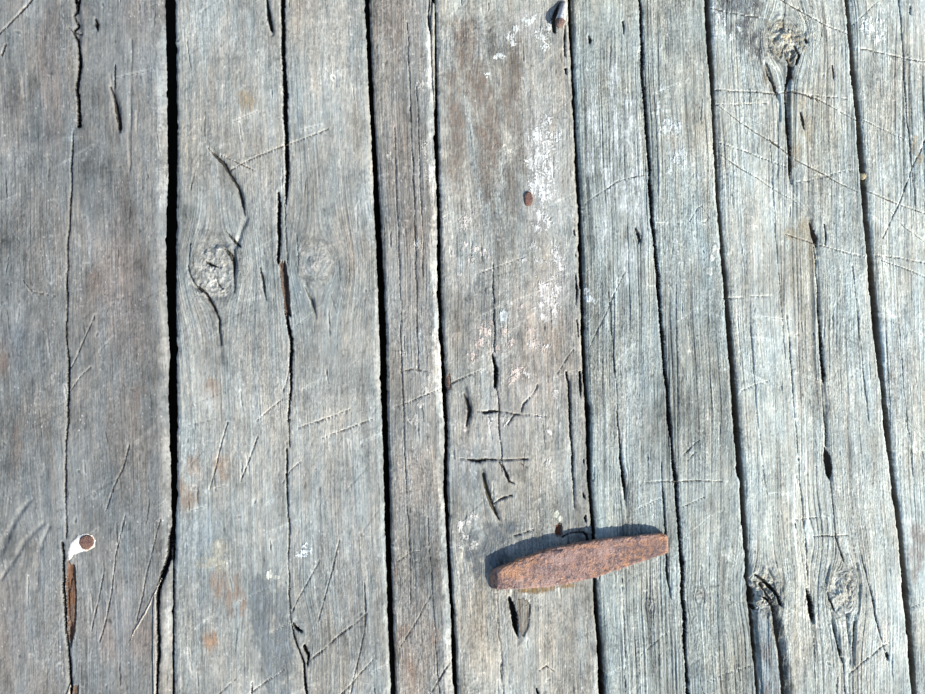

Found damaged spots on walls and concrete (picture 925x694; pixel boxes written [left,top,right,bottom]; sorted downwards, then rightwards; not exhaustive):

crack [277,0,298,263]
crack [765,46,801,189]
crack [61,0,82,694]
crack [283,312,310,694]
crack [638,0,689,694]
crack [813,251,827,444]